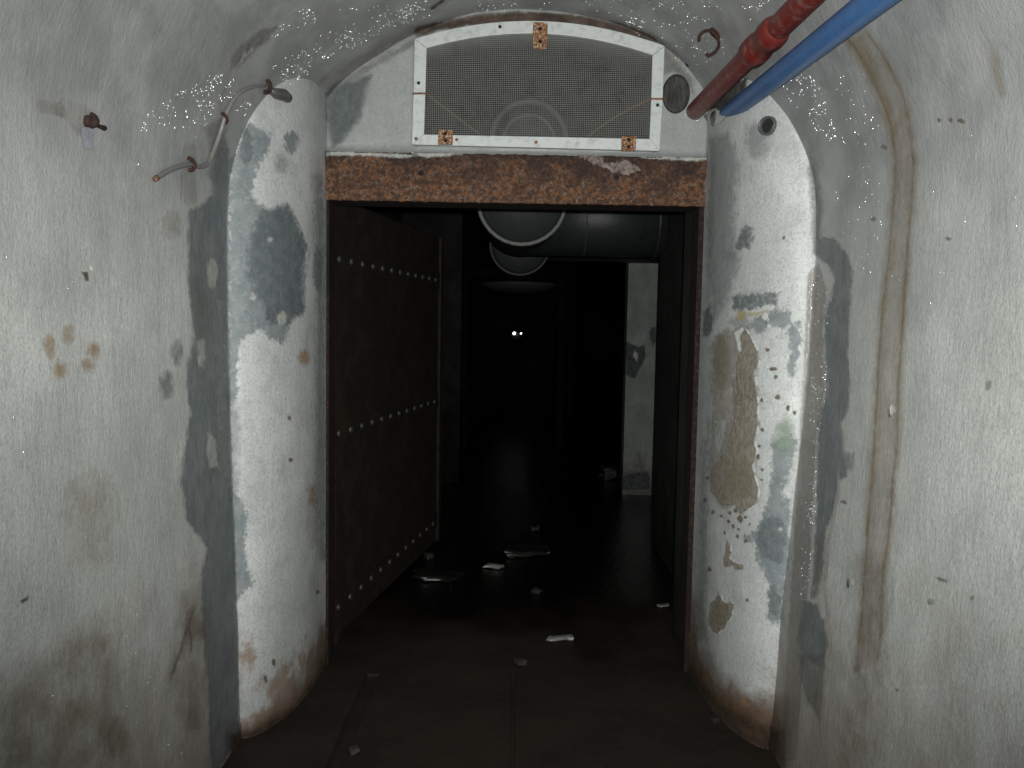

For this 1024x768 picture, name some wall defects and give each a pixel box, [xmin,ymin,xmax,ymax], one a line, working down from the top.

leakage [175,123,326,768]
peeling [704,327,796,570]
leakage [702,136,852,760]
peeling [708,592,734,635]
corrosion [688,609,777,760]